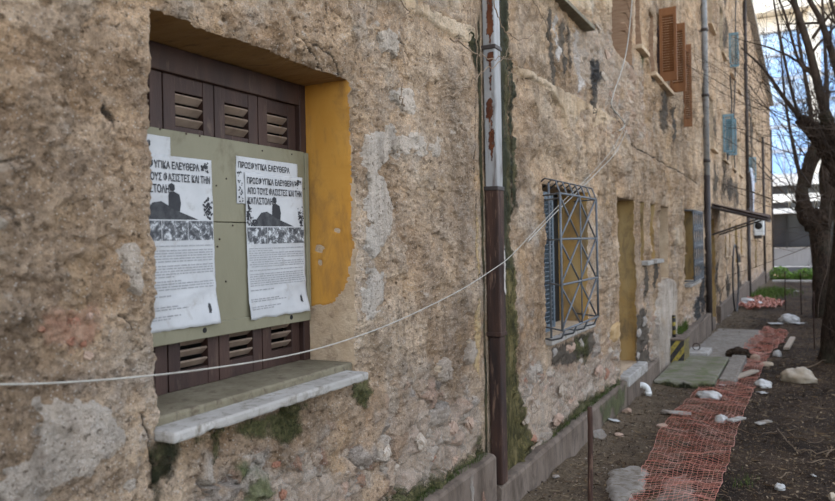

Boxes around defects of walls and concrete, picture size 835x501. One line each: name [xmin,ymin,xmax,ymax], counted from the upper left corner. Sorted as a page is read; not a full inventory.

spalling [375,21,402,59]
corrosion [486,0,495,161]
peeling [305,80,441,321]
damp [499,0,537,470]
spalling [0,396,126,501]
damp [209,428,220,461]
damp [276,403,303,443]